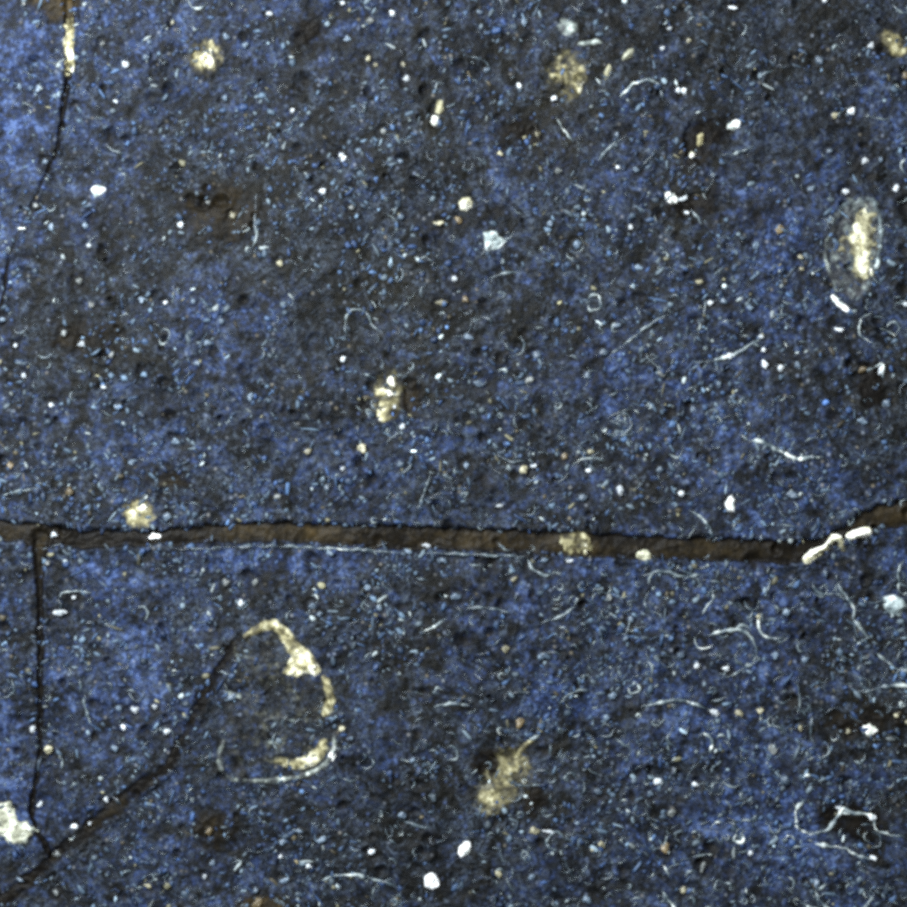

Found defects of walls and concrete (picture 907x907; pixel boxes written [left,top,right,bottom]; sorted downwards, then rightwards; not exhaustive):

crack [0,51,74,309]
crack [0,500,907,907]